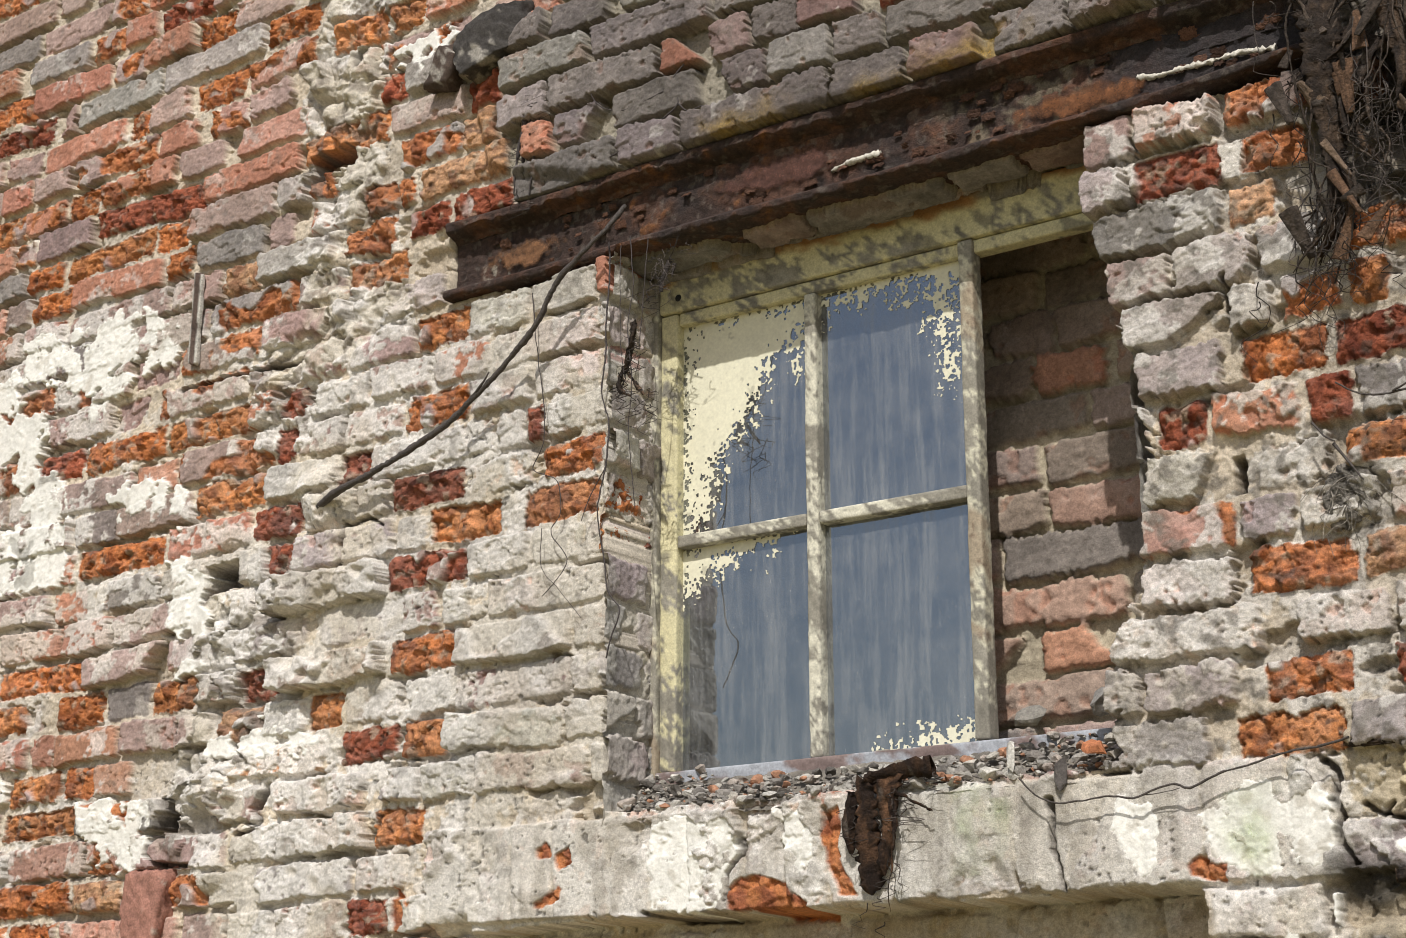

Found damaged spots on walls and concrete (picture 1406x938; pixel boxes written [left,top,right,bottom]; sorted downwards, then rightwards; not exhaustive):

rust [1154,25,1260,74]
spalling [199,0,535,292]
rust [703,144,848,205]
rust [865,150,886,169]
rust [893,53,1149,158]
rust [487,203,647,267]
peeling [0,185,305,640]
spalling [0,663,107,739]
spalling [153,658,206,715]
spalling [203,666,448,766]
spalling [0,767,179,938]
peeling [646,806,858,915]